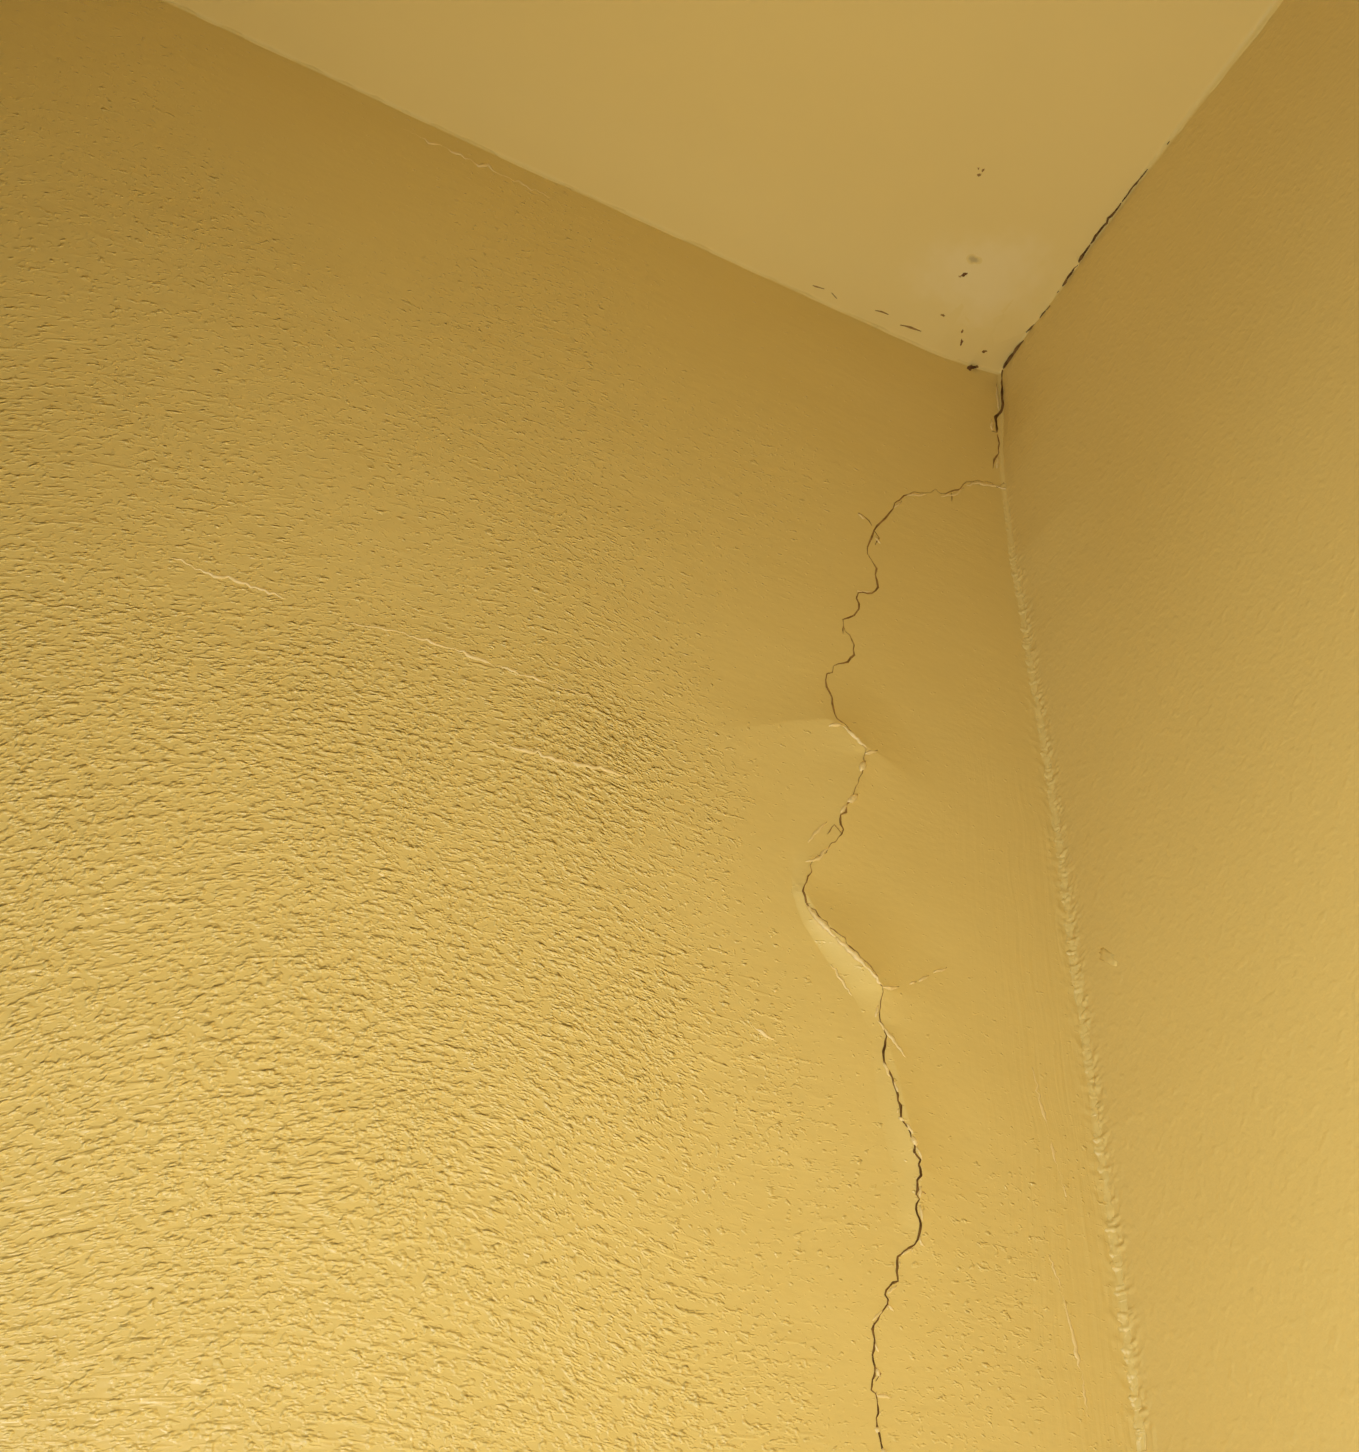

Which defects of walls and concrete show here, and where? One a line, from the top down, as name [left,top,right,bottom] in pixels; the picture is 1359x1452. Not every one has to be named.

crack [802,141,1170,1452]